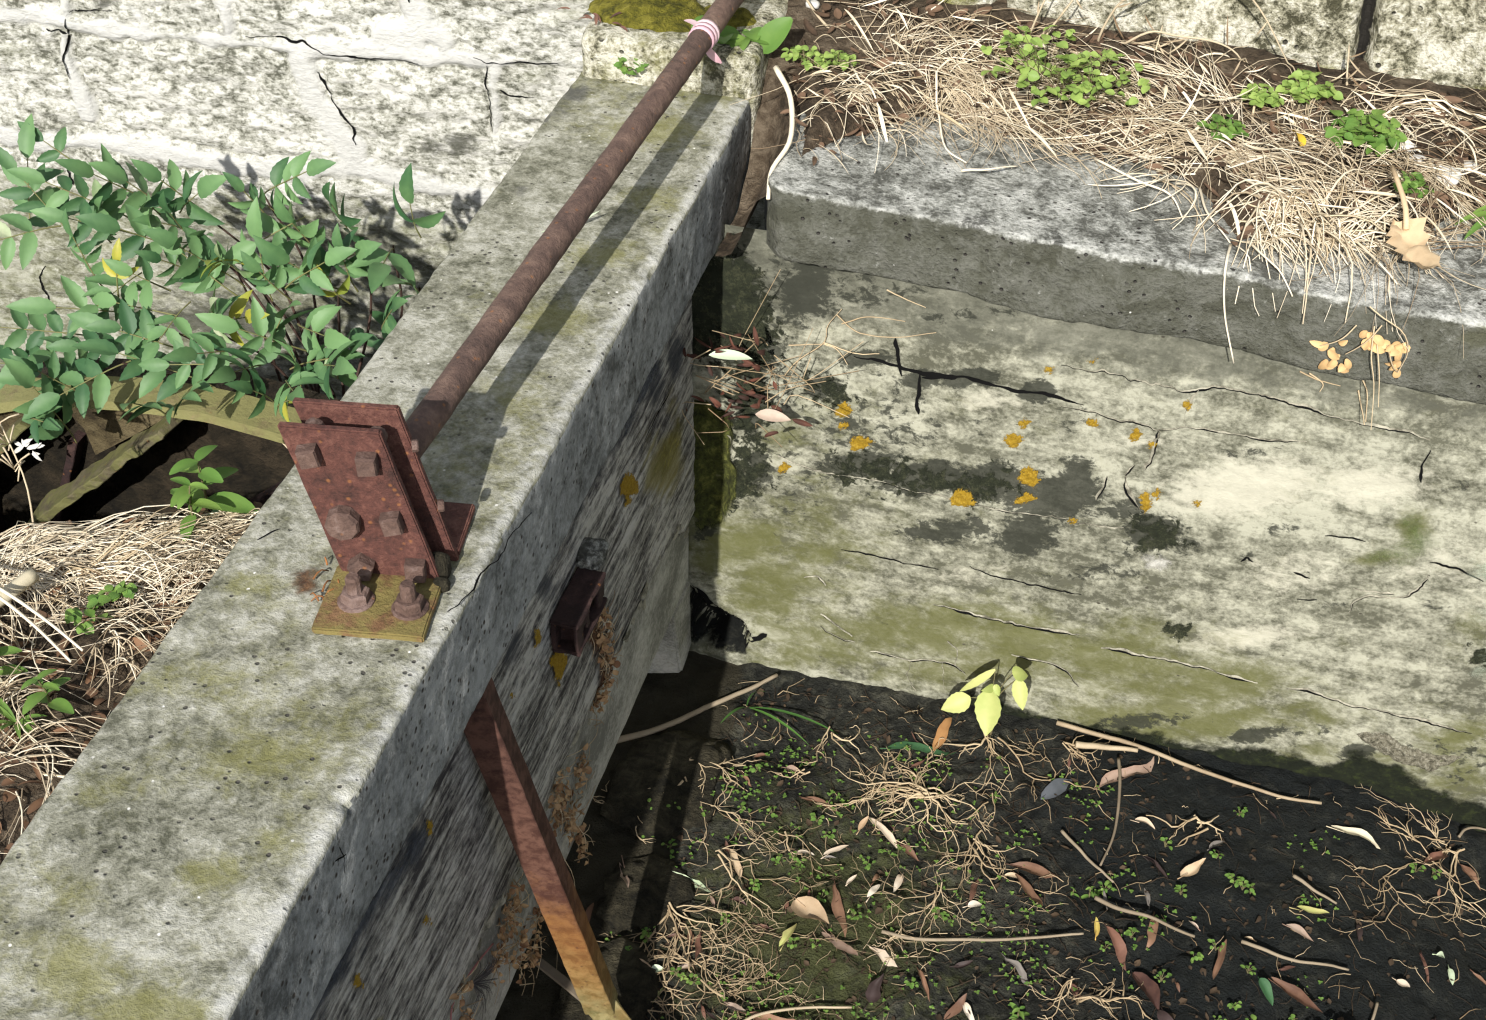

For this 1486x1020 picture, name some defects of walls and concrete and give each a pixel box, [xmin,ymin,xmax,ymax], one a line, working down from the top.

crack [246,36,415,145]
water stain [819,443,1026,516]
crack [778,338,1431,529]
corrosion [293,557,339,602]